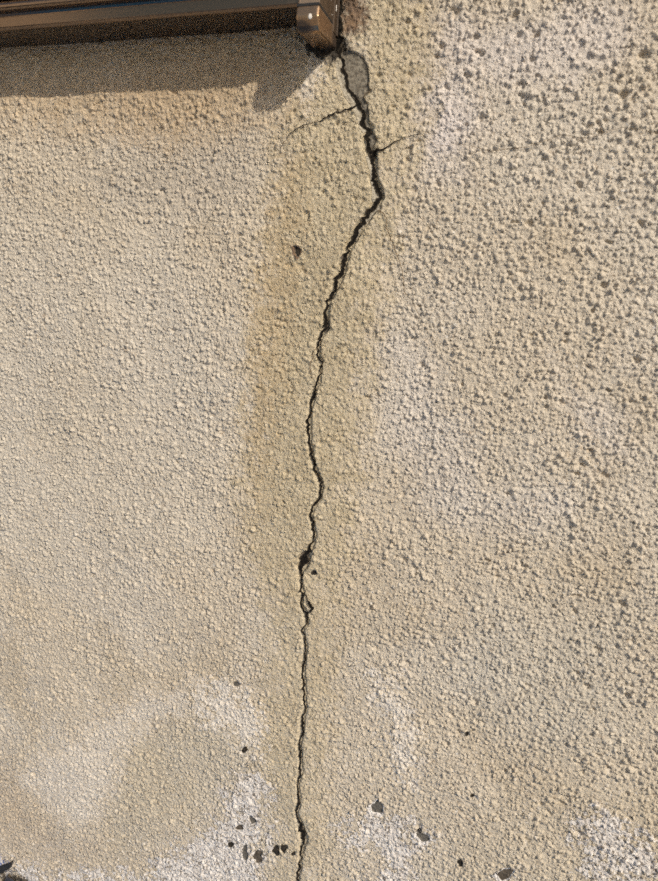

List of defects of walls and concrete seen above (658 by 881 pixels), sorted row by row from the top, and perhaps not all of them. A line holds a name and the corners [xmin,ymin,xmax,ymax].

crack [281,44,658,881]